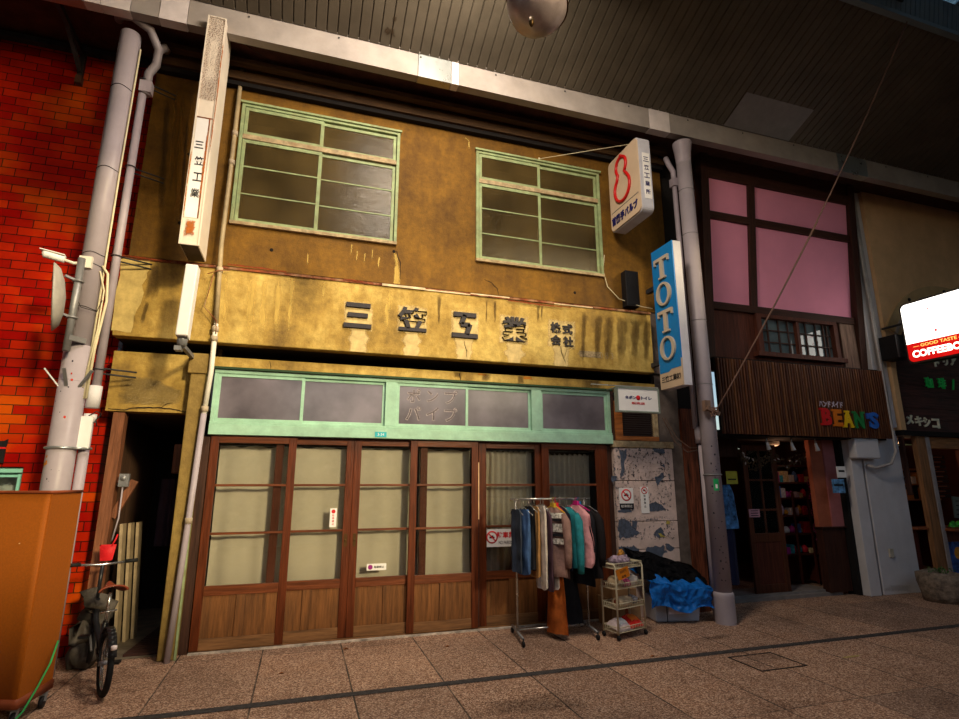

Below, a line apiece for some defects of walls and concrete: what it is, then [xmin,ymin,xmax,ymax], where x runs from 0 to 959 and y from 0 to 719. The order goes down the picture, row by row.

leakage [385,255,399,322]
leakage [349,328,368,352]
leakage [403,332,421,356]
leakage [455,338,473,360]
leakage [505,343,525,363]
leakage [553,345,569,366]
leakage [582,318,648,354]
peeling [611,447,675,569]